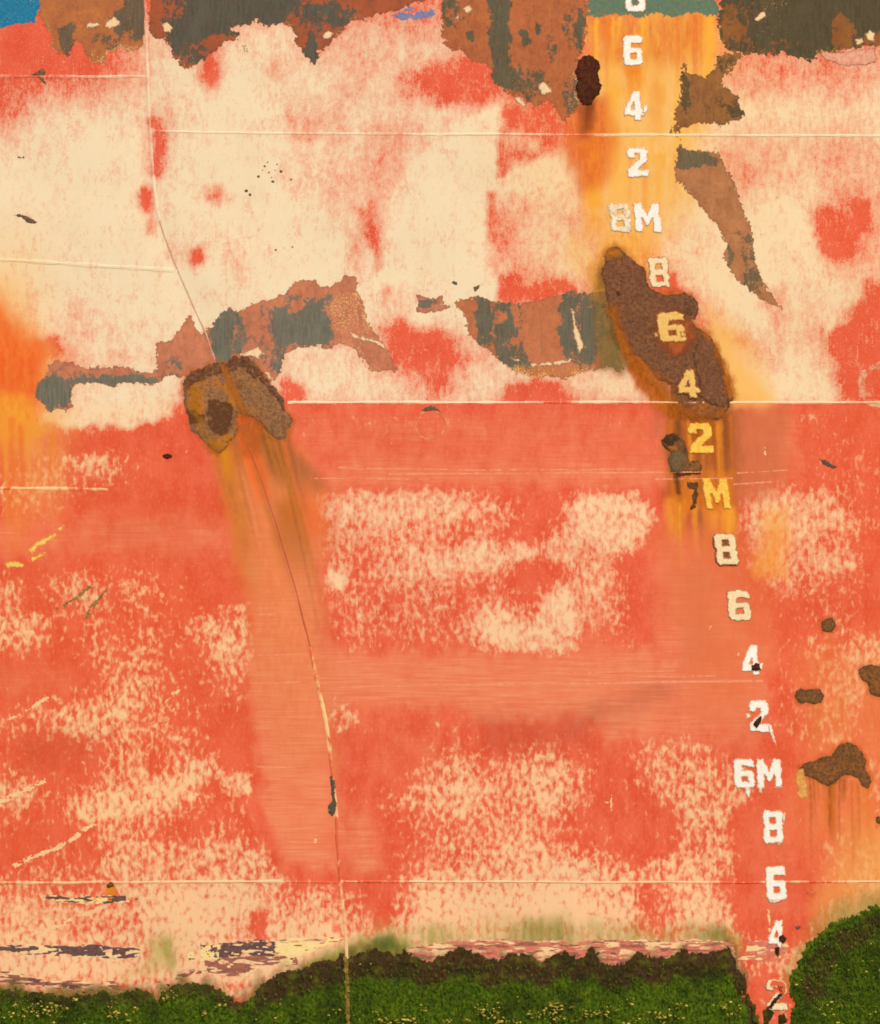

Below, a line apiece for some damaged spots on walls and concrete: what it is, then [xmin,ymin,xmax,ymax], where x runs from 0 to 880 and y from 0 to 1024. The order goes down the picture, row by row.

peeling [38,0,425,69]
peeling [440,0,589,122]
peeling [670,0,880,310]
peeling [35,275,398,413]
peeling [416,285,624,380]
corrosion [553,0,880,919]
corrosion [182,355,350,854]